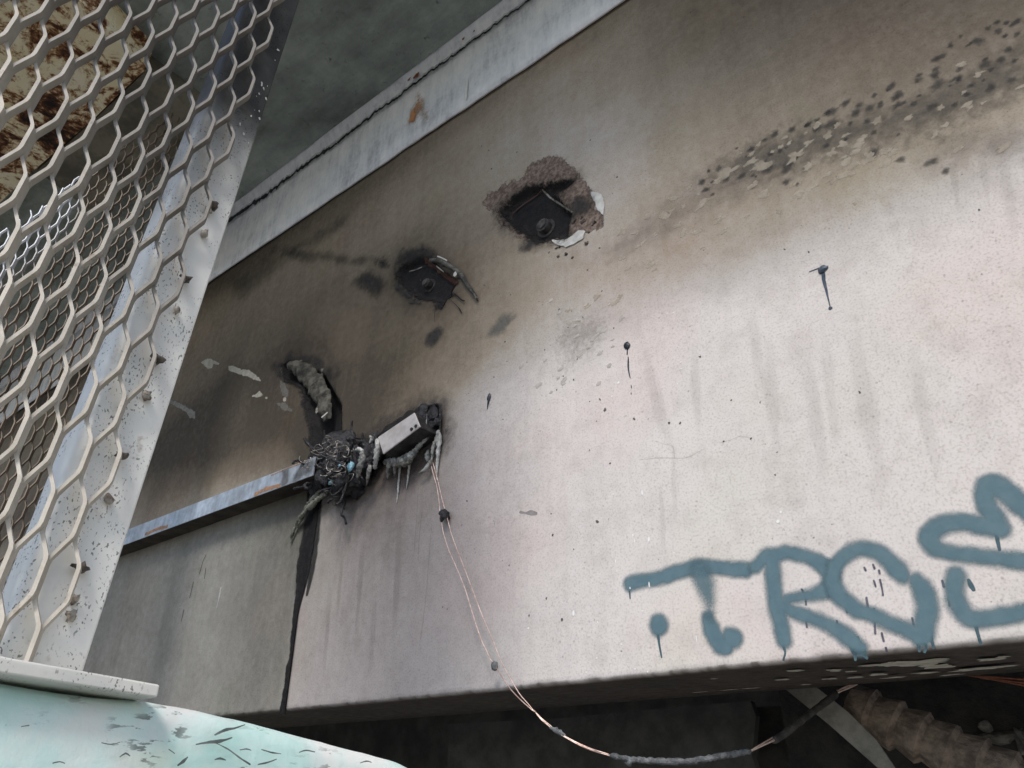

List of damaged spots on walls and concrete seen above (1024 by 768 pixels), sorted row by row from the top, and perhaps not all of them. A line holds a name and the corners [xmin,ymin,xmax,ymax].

rust [409,99,422,122]
spalling [482,156,604,259]
spalling [201,351,342,454]